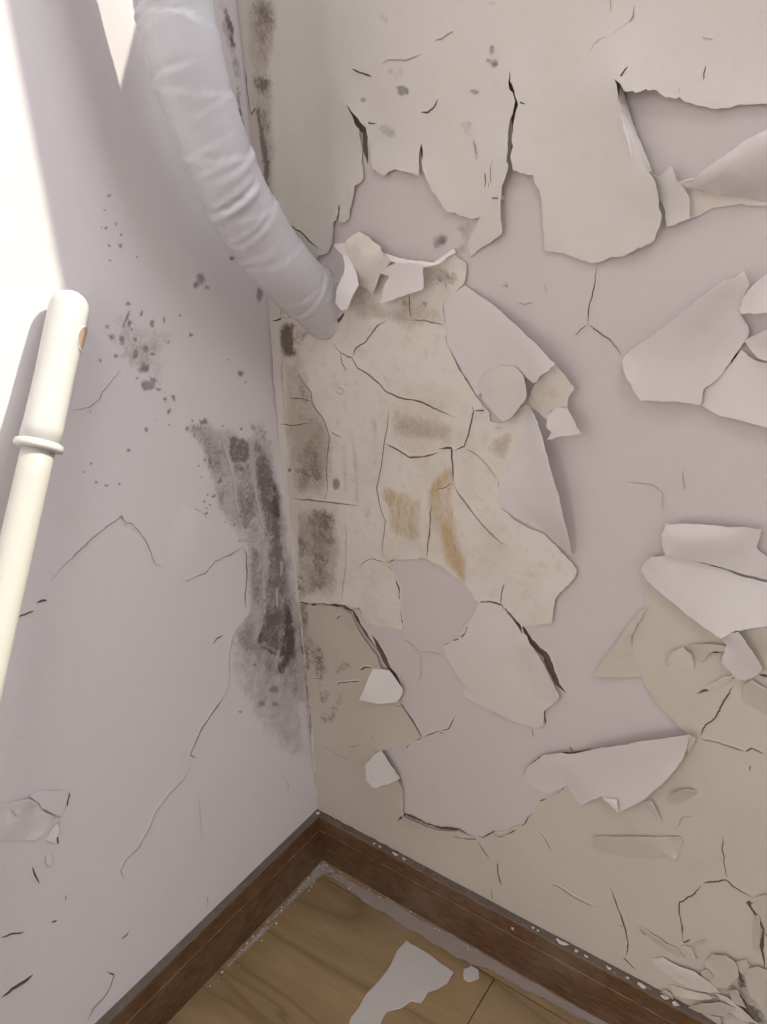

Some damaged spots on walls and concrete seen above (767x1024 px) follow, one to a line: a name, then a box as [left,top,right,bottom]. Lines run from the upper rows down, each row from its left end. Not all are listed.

leakage [257,113,268,181]
leakage [107,302,175,414]
leakage [281,324,305,356]
leakage [198,425,321,671]
peeling [238,0,767,1024]
crack [19,514,248,882]
spalling [0,790,71,884]
crack [550,836,767,1024]